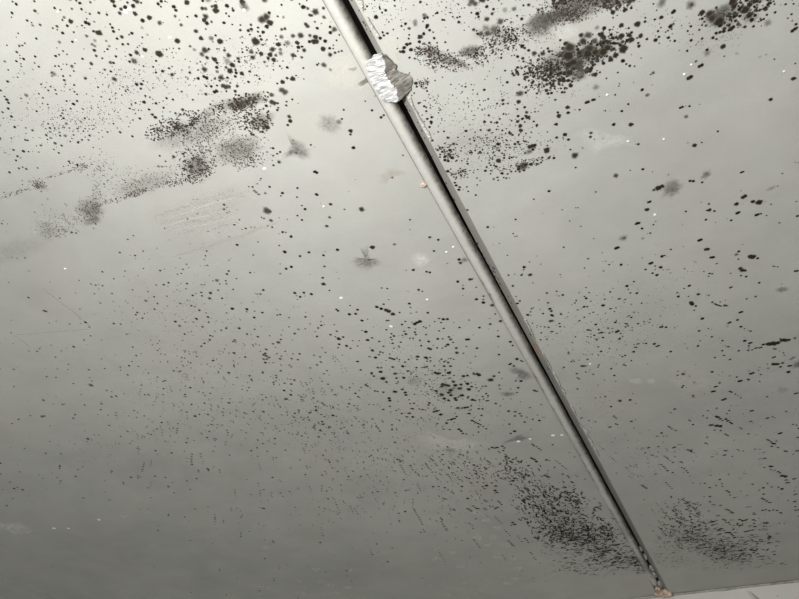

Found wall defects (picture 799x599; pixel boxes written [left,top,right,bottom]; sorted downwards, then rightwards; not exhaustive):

water stain [0,0,343,239]
water stain [526,281,675,391]
water stain [687,311,799,382]
water stain [120,243,645,575]
water stain [629,426,695,489]
water stain [688,382,754,445]
water stain [651,449,799,565]